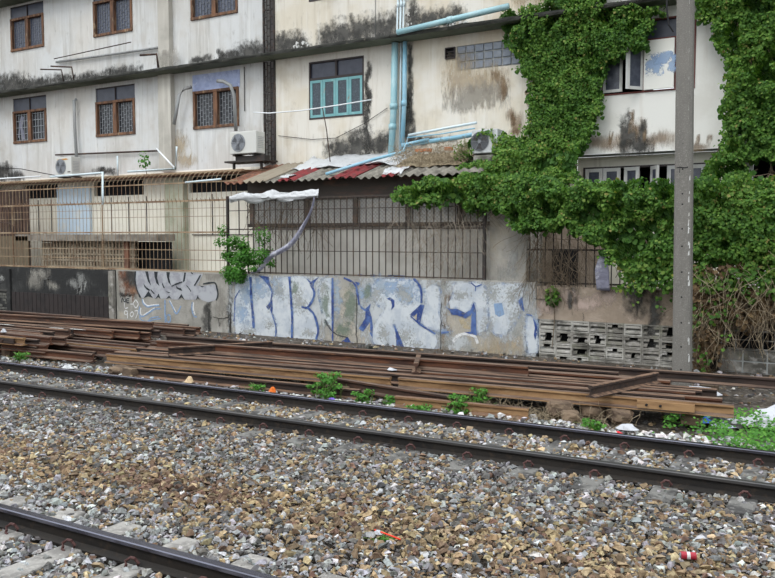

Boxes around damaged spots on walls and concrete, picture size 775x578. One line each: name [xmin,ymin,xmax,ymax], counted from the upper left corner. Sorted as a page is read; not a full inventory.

leakage [192,0,463,63]
mould [0,65,142,91]
leakage [325,62,389,157]
leakage [586,112,673,156]